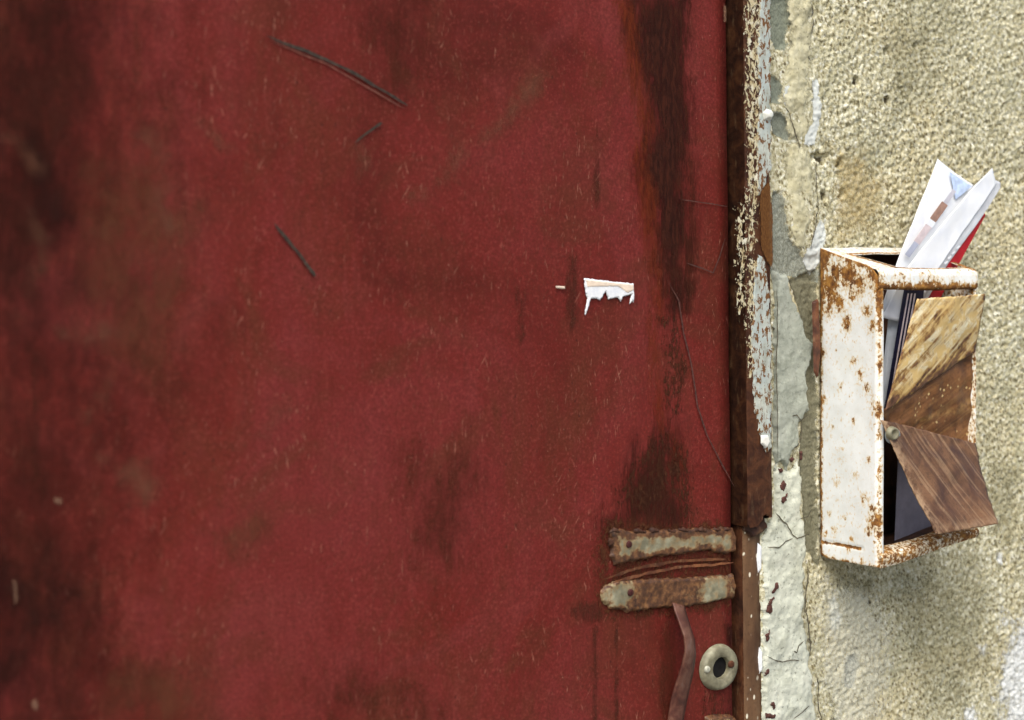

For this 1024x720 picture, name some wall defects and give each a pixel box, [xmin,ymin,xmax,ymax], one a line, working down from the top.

corrosion [622,0,693,418]
peeling [733,0,826,564]
corrosion [593,517,730,621]
corrosion [689,598,732,649]